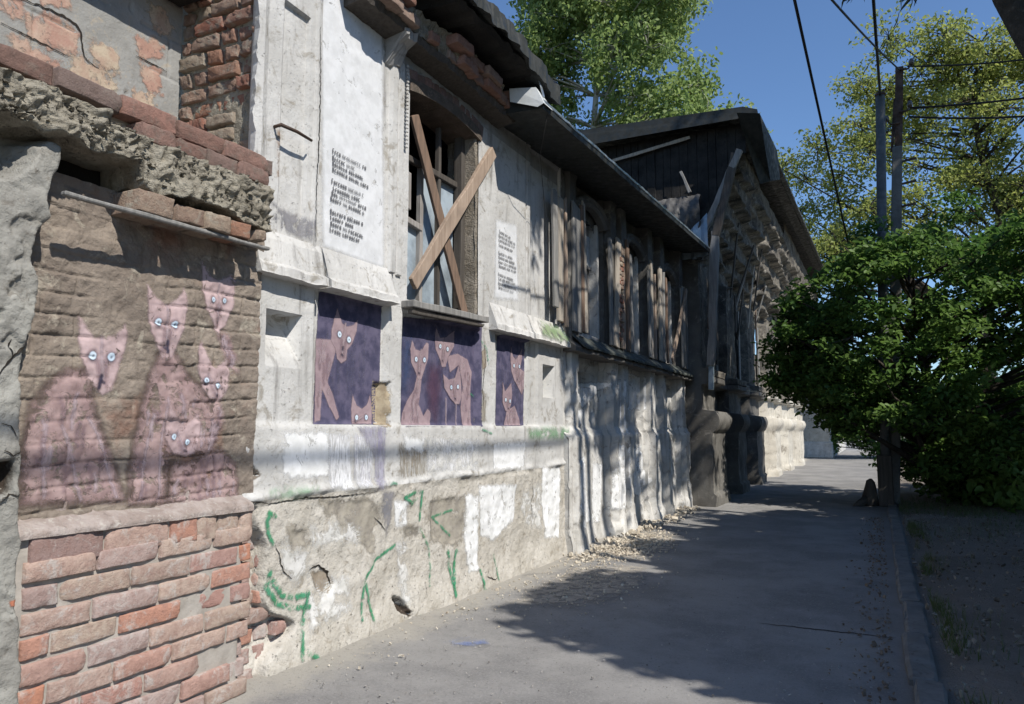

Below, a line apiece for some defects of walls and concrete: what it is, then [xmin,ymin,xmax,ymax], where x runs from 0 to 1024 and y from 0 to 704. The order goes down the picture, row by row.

crack [2,0,99,69]
peeling [0,0,120,90]
peeling [131,34,165,106]
flaking render [371,380,391,427]
crack [275,545,330,583]
flaking render [280,496,380,630]